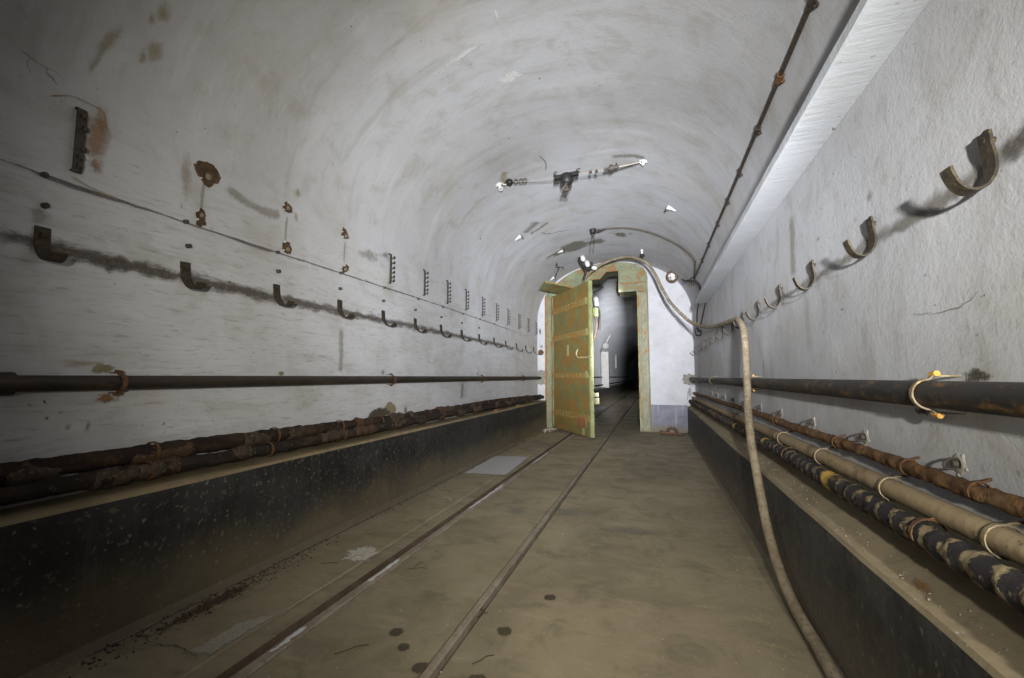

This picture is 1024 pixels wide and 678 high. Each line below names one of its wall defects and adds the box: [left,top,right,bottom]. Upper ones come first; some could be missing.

damp [0,159,507,329]
damp [965,368,990,382]